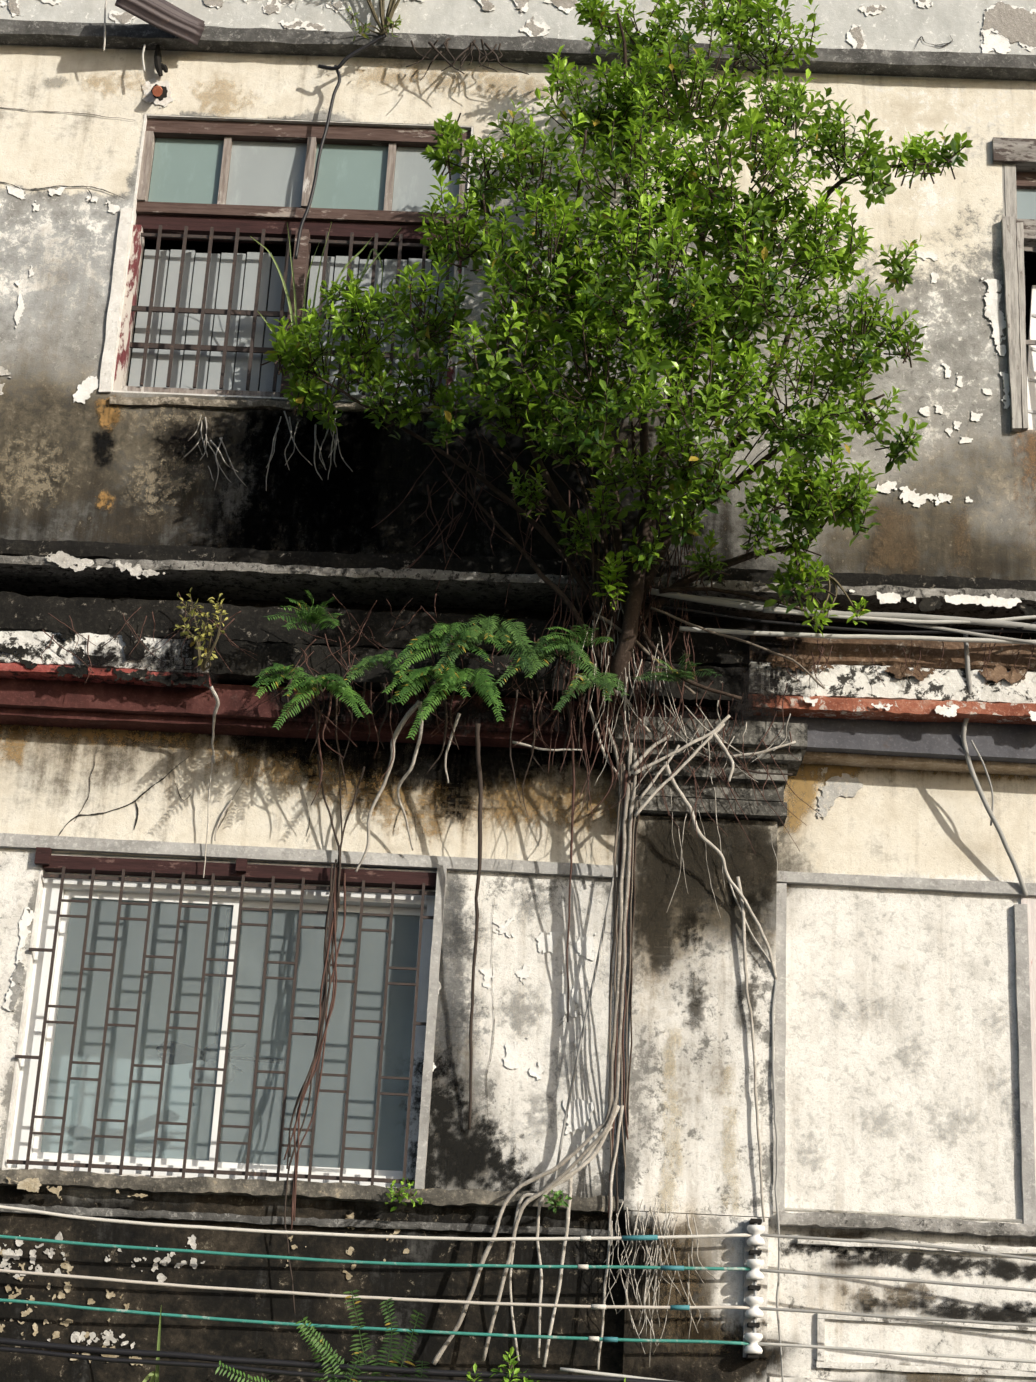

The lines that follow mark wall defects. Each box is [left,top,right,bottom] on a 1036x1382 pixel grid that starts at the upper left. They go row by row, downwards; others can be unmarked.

peeling [73,376,99,404]
peeling [981,277,1010,409]
leakage [119,394,640,562]
flaking render [45,551,165,579]
flaking render [876,591,1036,621]
leakage [0,619,814,836]
leakage [405,879,538,1192]
peeling [0,1232,143,1366]
peeling [105,1235,205,1282]
leakage [624,1226,765,1382]
leakage [784,1243,1036,1323]
leakage [901,1364,985,1382]